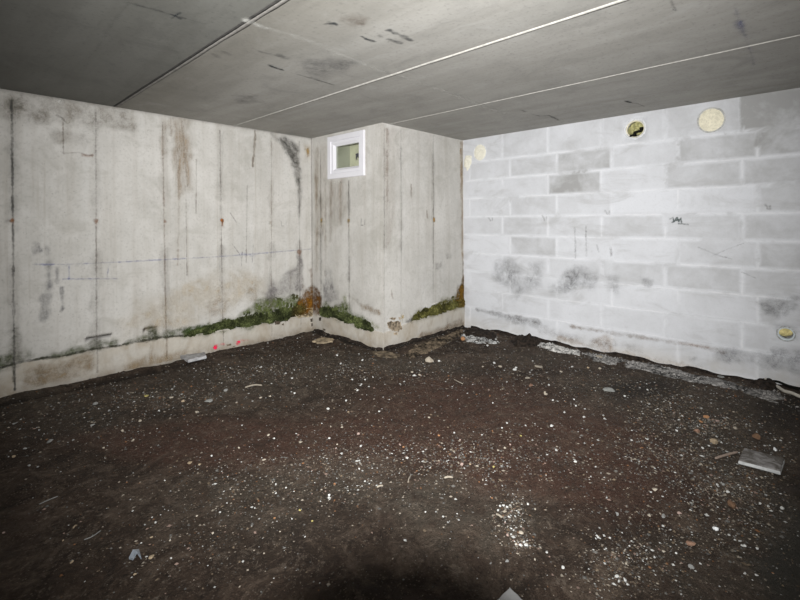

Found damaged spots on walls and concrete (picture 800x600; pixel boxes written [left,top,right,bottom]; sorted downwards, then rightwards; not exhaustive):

rust [298,287,322,315]